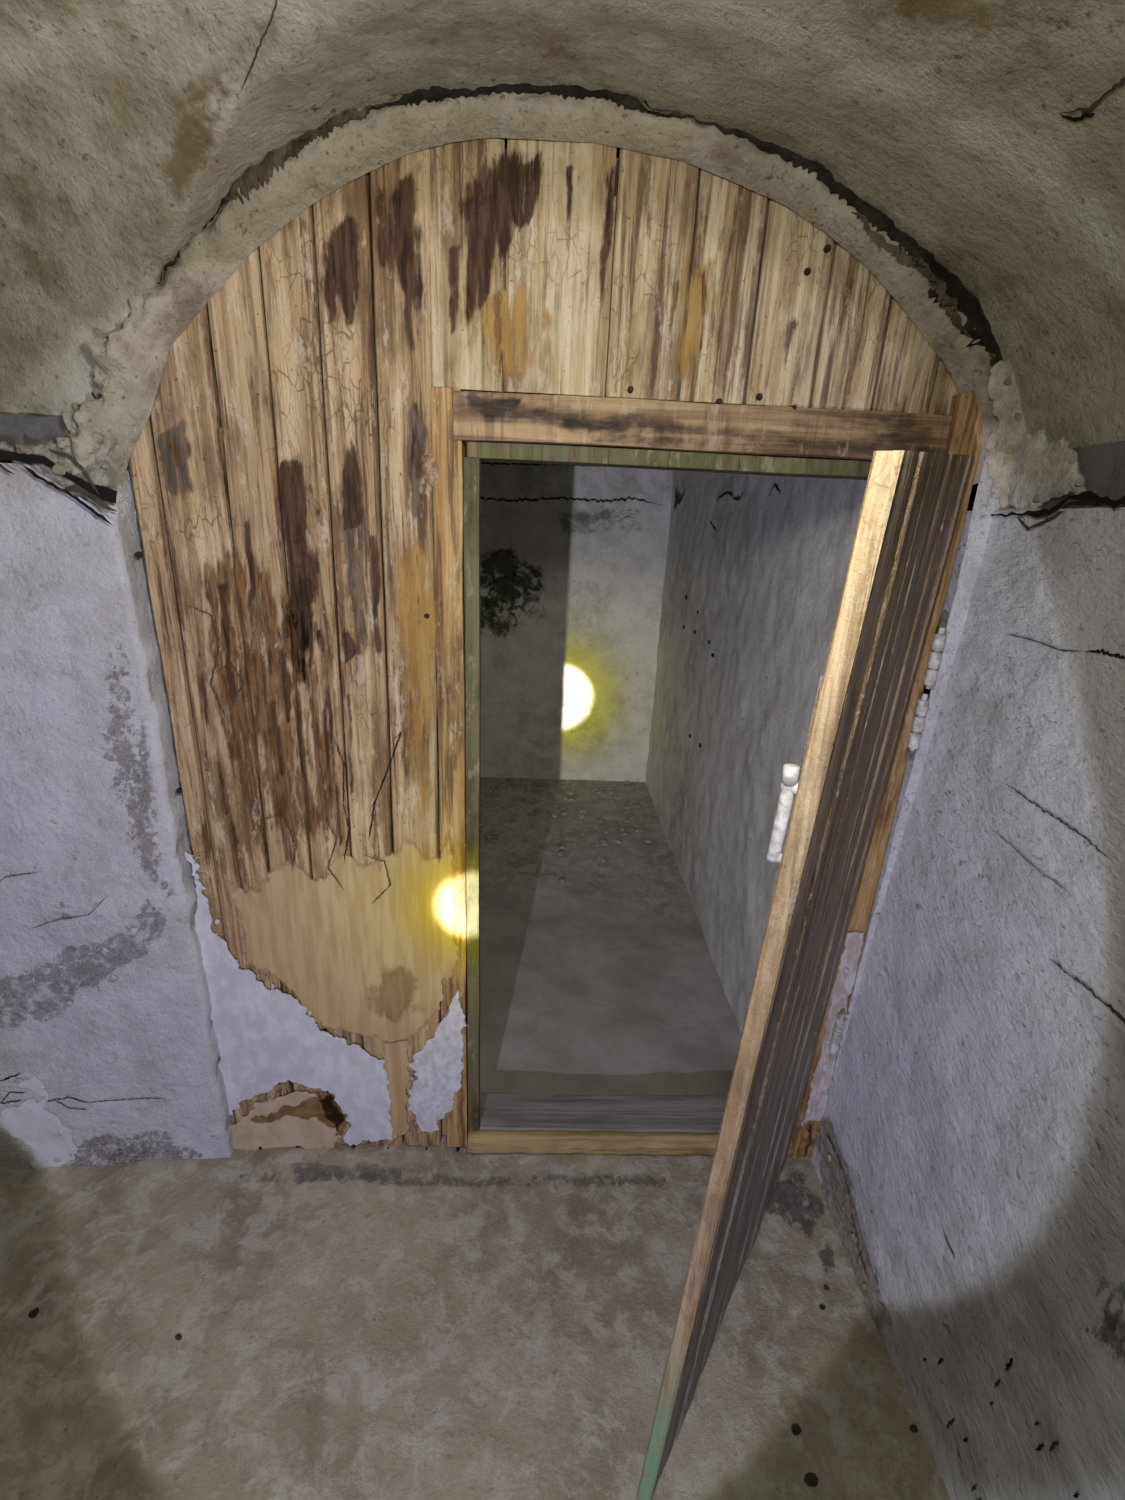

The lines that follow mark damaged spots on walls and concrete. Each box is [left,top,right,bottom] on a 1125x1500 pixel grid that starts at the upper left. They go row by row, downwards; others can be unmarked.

crack [242,0,277,89]
crack [293,104,382,143]
crack [1059,77,1125,122]
crack [156,192,230,284]
water stain [321,215,359,325]
water stain [377,174,423,349]
crack [852,211,998,369]
spalling [0,420,120,510]
crack [991,491,1125,531]
mould [480,549,543,637]
water stain [196,441,459,1139]
peeling [184,852,468,1146]